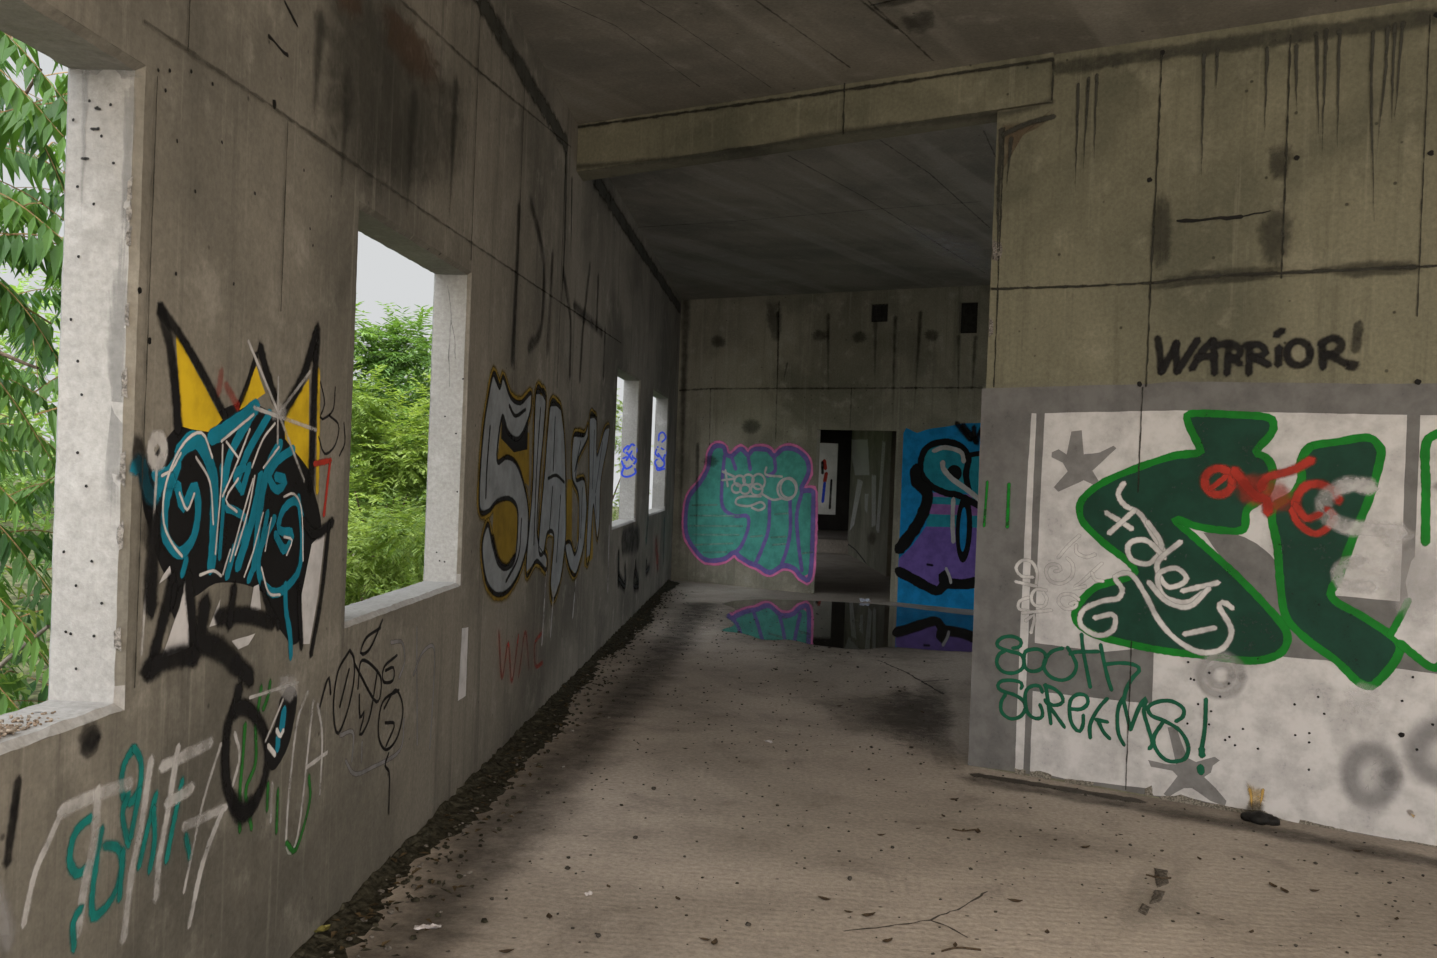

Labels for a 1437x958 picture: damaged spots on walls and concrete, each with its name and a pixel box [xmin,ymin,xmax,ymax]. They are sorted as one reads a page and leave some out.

damp [1054,11,1434,204]
damp [996,114,1056,252]
damp [1161,214,1288,287]
crack [845,891,988,938]